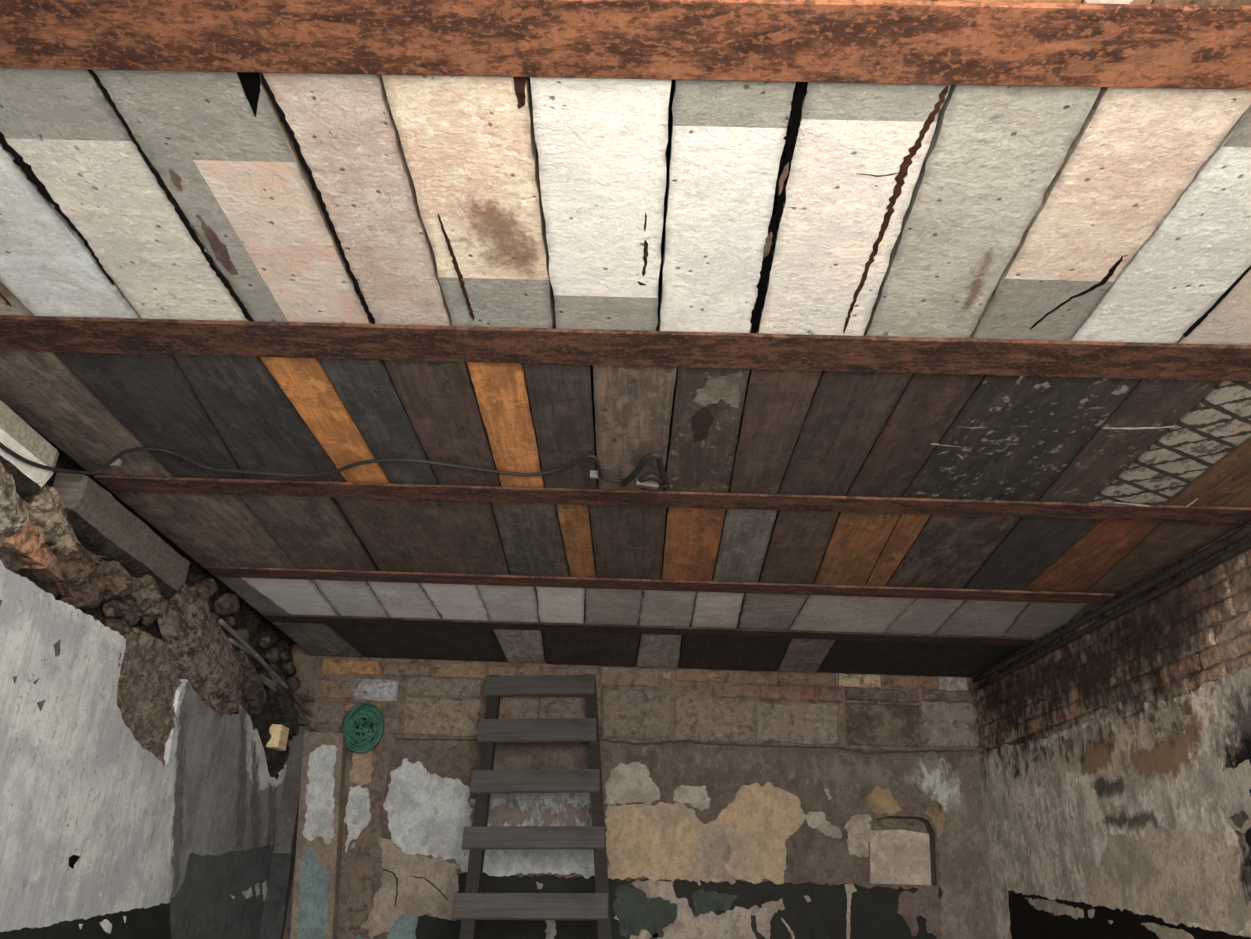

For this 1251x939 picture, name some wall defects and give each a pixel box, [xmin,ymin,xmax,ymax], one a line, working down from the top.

crack [843,86,948,333]
crack [1183,266,1251,337]
flaking render [115,627,182,766]
flaking render [240,697,290,780]
flaking render [924,800,945,837]
flaking render [69,855,80,869]
peeling [100,916,126,933]
peeling [356,837,461,939]
peeling [545,920,557,939]
peeling [605,782,902,939]